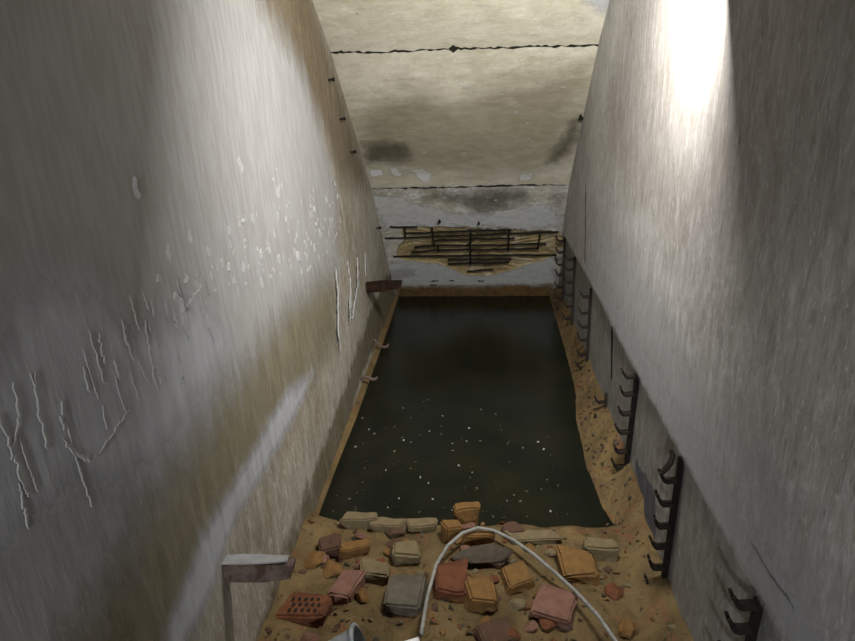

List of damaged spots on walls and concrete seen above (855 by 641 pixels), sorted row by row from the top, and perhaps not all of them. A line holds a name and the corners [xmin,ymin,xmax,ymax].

water stain [0,0,358,641]
water stain [584,237,820,641]
crack [749,540,794,608]